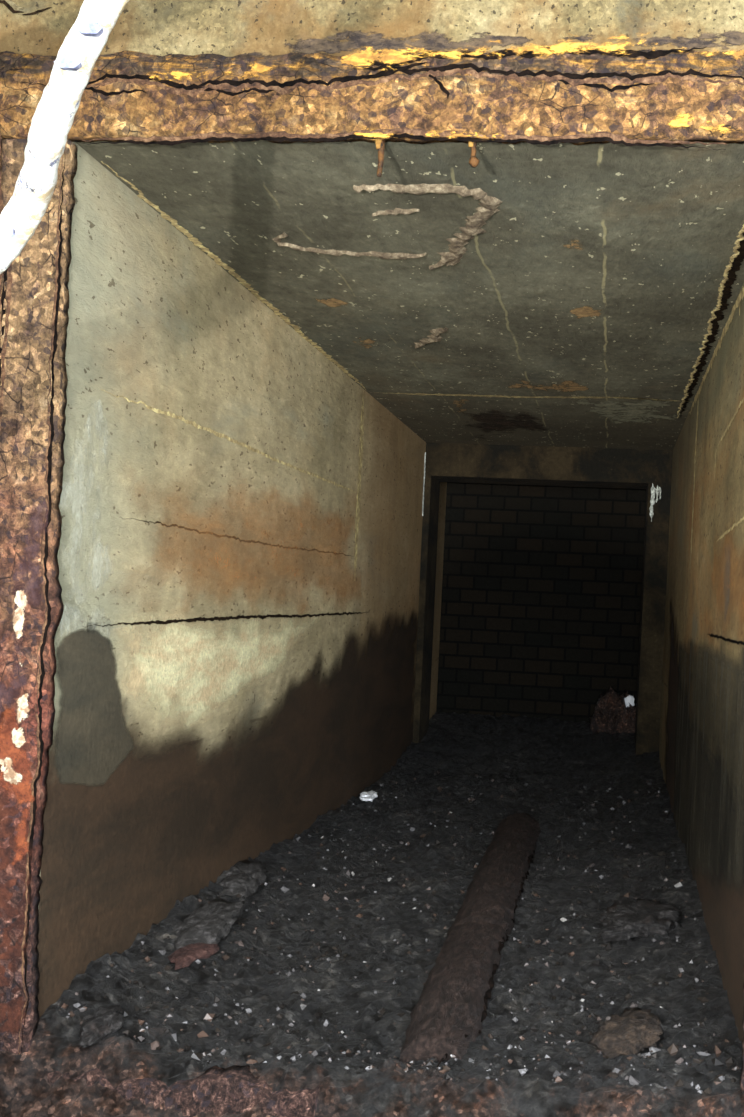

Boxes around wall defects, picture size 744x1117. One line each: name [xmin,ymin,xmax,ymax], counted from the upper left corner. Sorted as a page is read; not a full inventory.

crack [0,0,52,15]
corrosion [149,66,196,80]
crack [85,47,744,99]
corrosion [224,30,744,79]
corrosion [667,112,741,134]
crack [0,135,8,214]
corrosion [354,128,393,177]
corrosion [425,130,505,168]
crack [0,262,13,428]
crack [18,127,727,1055]
crack [707,634,744,645]